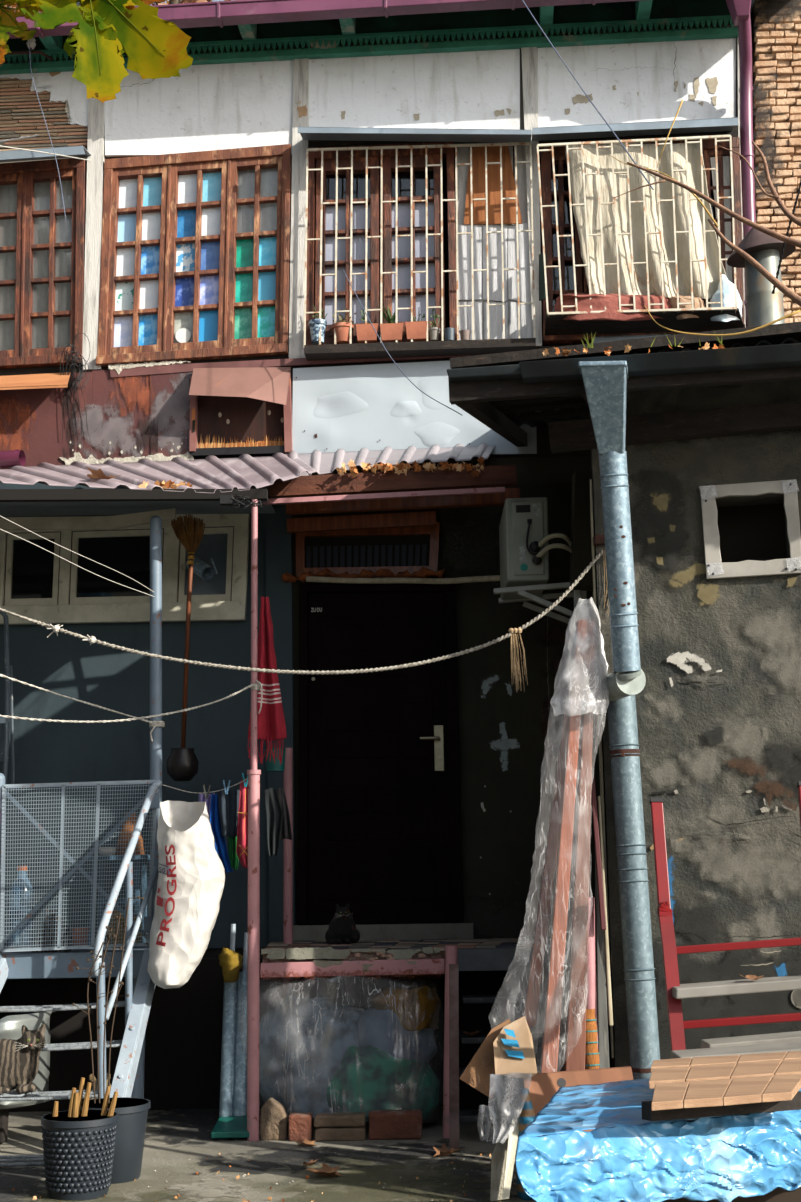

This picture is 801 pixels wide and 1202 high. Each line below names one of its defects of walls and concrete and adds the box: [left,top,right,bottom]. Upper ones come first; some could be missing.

flaking render [0,72,88,151]
peeling [674,77,718,106]
corrosion [71,372,193,459]
water stain [631,469,720,606]
water stain [646,651,722,718]
water stain [746,610,801,686]
water stain [651,719,801,800]